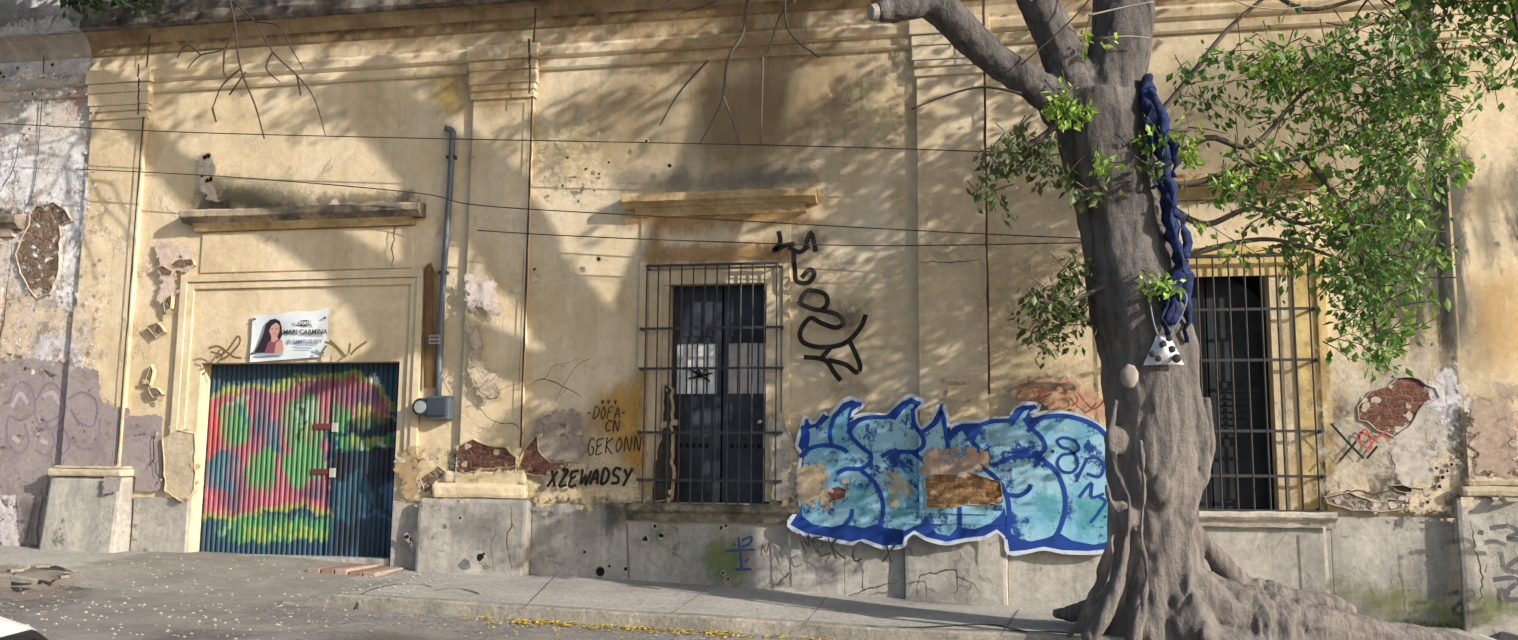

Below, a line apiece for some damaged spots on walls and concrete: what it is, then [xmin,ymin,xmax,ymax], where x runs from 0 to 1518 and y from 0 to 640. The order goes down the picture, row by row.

peeling [0,9,79,35]
water stain [1499,165,1518,238]
peeling [464,273,505,405]
peeling [393,383,678,521]
spalling [882,445,1003,509]
peeling [0,494,21,546]
spalling [404,532,417,546]
spalling [474,550,487,562]